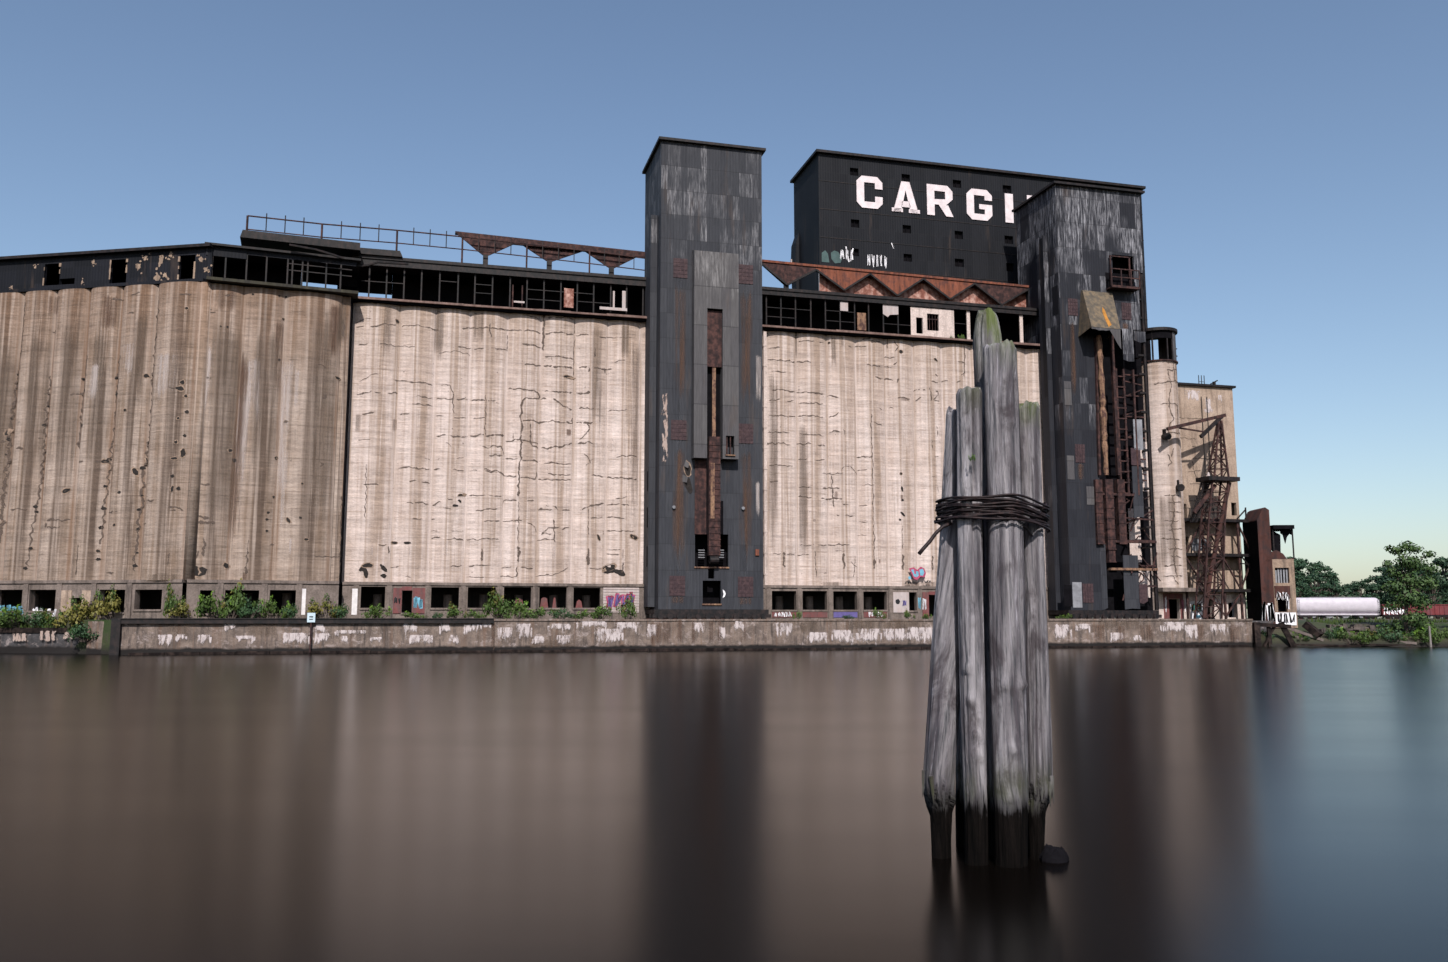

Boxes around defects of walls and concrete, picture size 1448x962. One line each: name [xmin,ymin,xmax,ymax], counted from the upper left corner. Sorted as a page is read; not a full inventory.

damp [205,342,288,475]
crack [315,314,637,578]
crack [762,337,966,577]